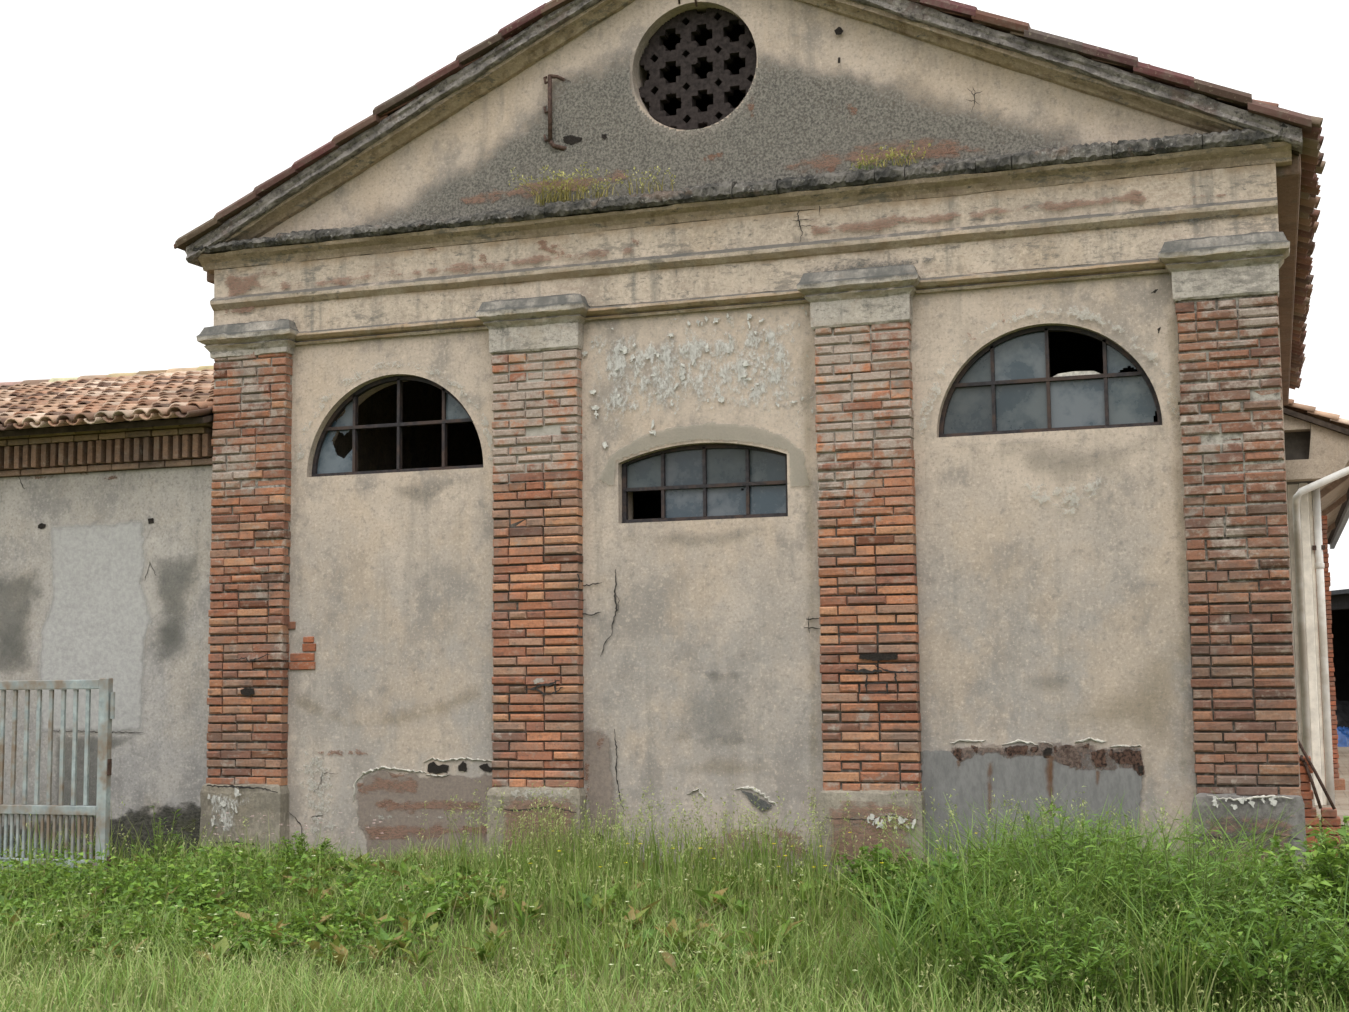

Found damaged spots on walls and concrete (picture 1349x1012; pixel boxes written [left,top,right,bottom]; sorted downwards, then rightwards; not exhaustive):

spalling [951,738,1145,776]